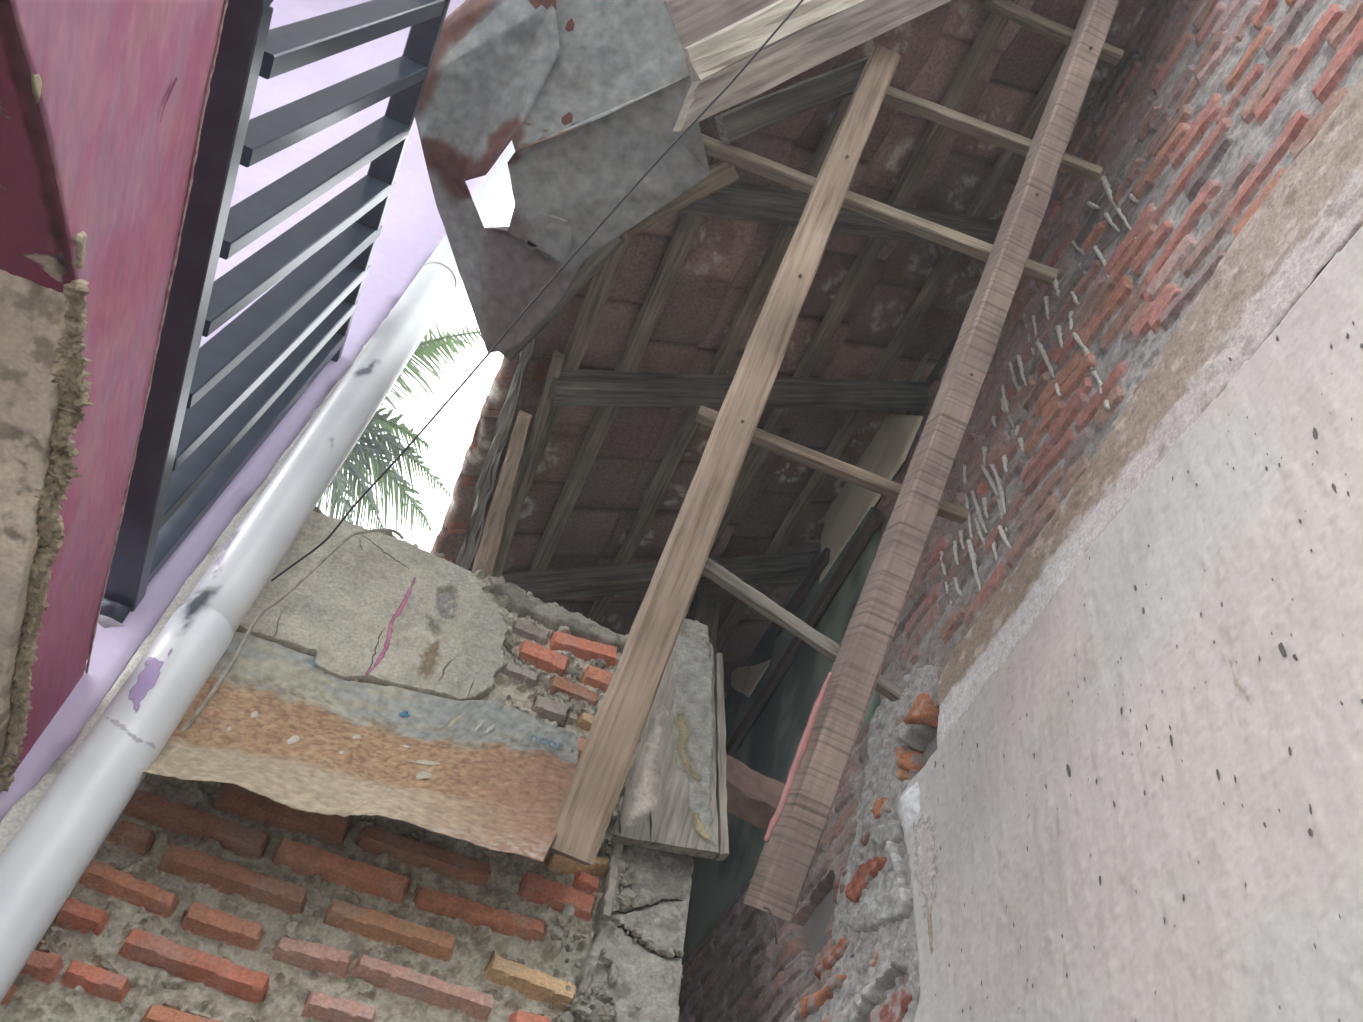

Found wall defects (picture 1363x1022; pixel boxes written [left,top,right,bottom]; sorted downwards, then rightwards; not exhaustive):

corrosion [528,0,575,32]
peeling [31,73,42,104]
corrosion [561,112,573,125]
spalling [437,590,459,619]
spalling [784,663,940,1022]
crack [612,899,683,958]